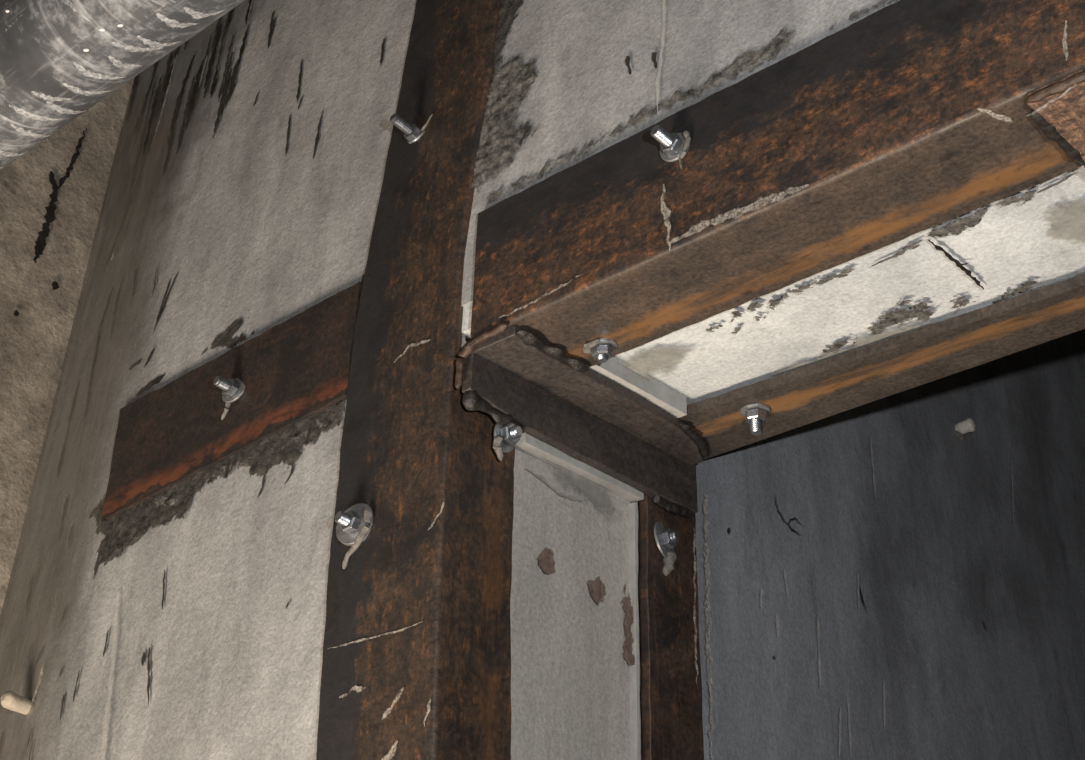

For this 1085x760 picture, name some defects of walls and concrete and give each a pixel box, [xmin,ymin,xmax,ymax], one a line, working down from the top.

crack [33,127,87,263]
water stain [1046,199,1085,243]
crack [928,240,984,290]
peeling [868,299,936,335]
peeling [950,296,976,312]
peeling [994,281,1043,304]
peeling [822,338,857,354]
spalling [89,403,343,579]